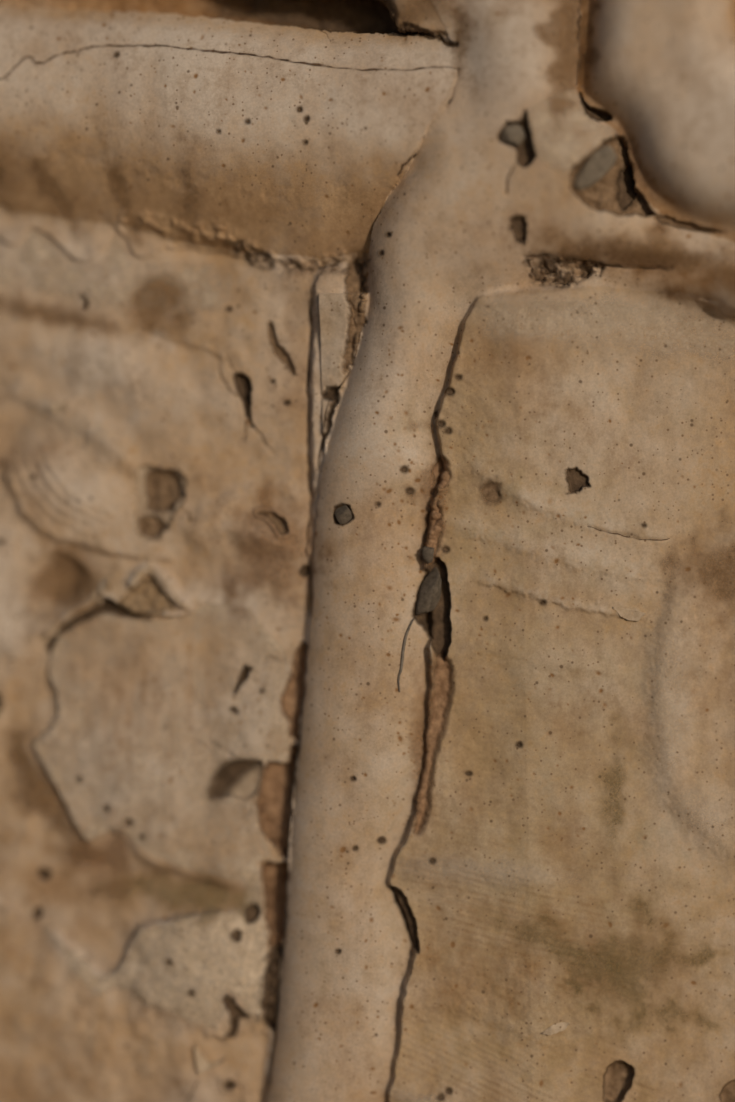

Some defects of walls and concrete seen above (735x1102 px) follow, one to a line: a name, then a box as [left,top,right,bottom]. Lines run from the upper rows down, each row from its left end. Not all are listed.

crack [0,44,459,104]
spalling [527,256,604,287]
crack [305,296,361,614]
spalling [46,578,172,652]
flaking render [46,643,307,1039]